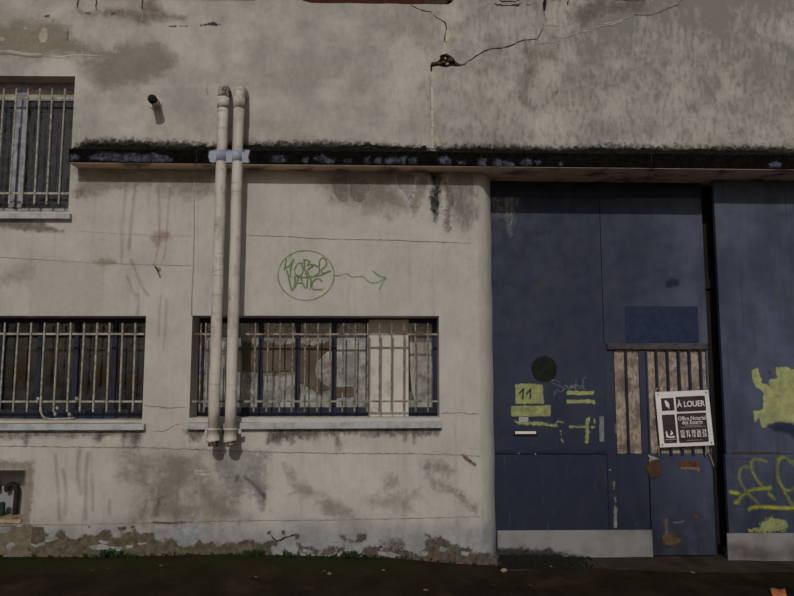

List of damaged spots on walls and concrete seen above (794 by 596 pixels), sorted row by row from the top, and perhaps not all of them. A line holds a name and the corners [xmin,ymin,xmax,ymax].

leakage [0,23,94,55]
crack [462,0,683,65]
leakage [429,172,473,228]
peeling [0,524,278,557]
peeling [296,533,500,566]